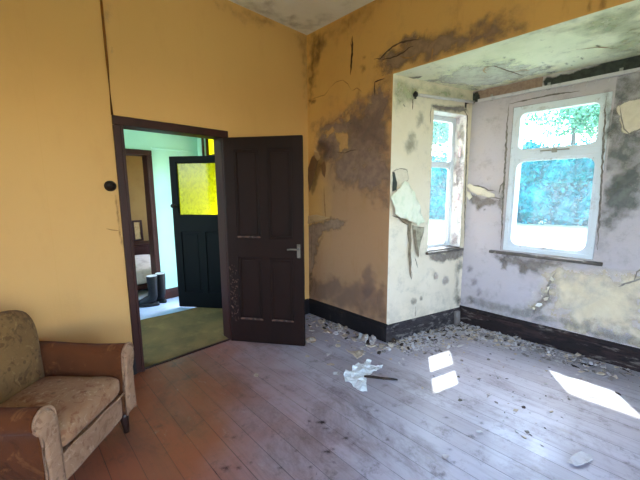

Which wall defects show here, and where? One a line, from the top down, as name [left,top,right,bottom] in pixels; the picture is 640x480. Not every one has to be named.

crack [311,36,362,100]
flaking render [314,86,408,202]
flaking render [430,105,501,239]
damp [543,55,640,226]
flaking render [309,219,344,277]
flaking render [532,272,556,314]
damp [500,255,640,346]
crack [619,269,640,287]